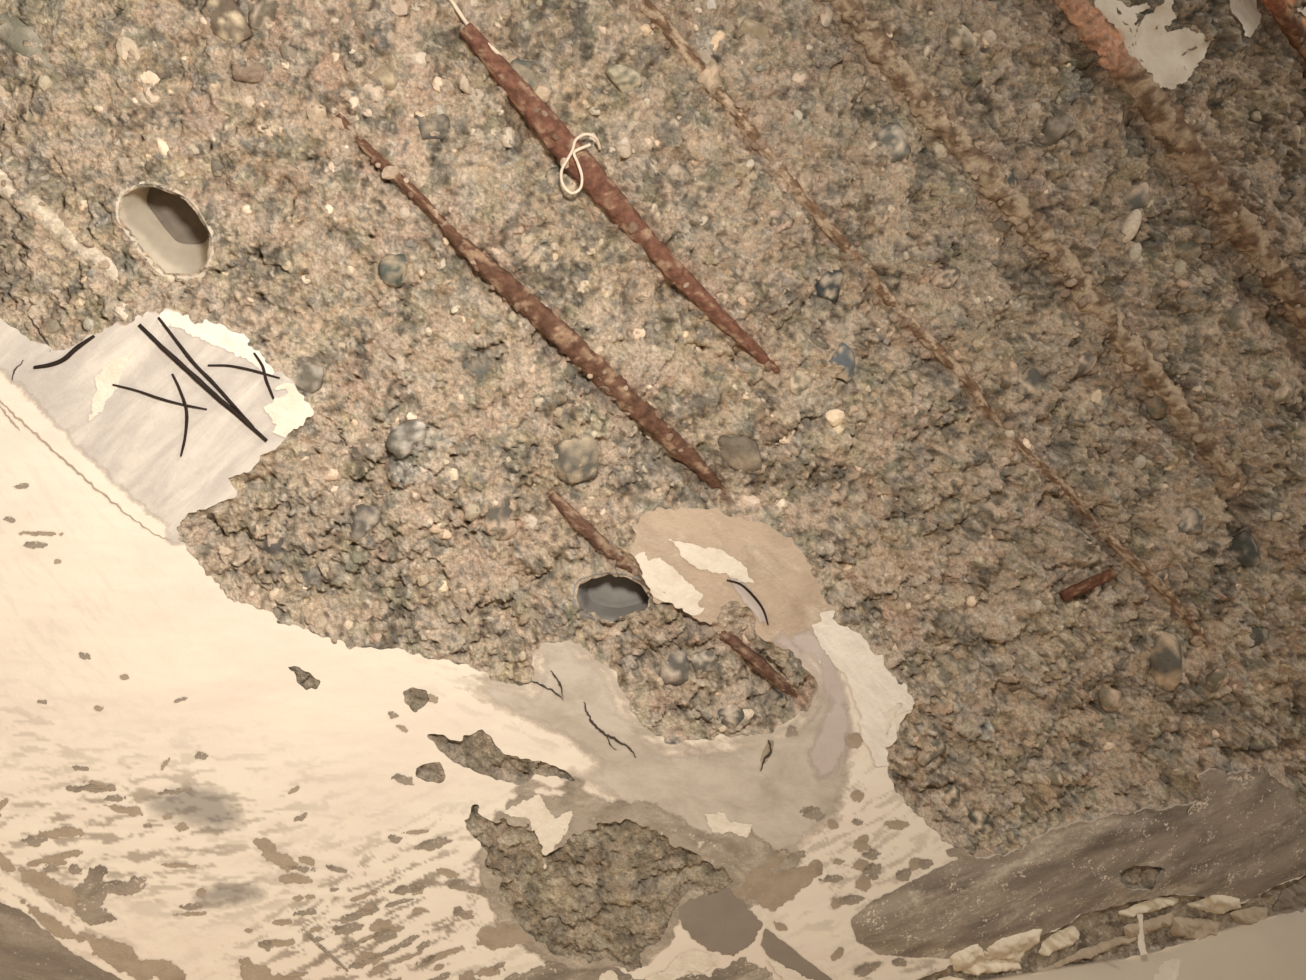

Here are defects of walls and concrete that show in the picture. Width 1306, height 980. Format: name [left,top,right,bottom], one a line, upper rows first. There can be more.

crack [0,319,169,540]
peeling [0,308,286,544]
spalling [460,22,576,161]
spalling [391,172,727,493]
spalling [575,149,780,374]
spalling [829,0,1240,483]
spalling [1052,0,1306,340]
peeling [630,507,835,650]
spalling [416,730,575,785]
peeling [0,852,186,980]
spalling [464,804,832,980]
peeling [851,766,1306,980]